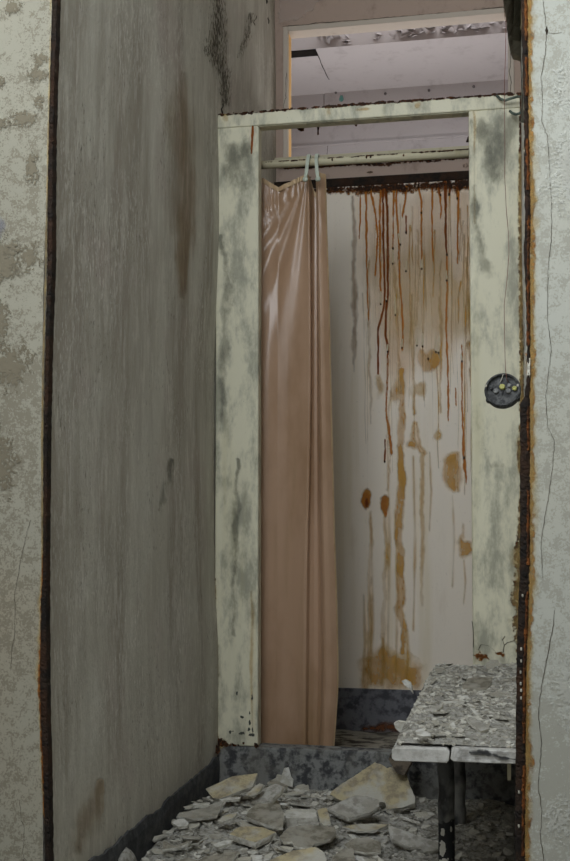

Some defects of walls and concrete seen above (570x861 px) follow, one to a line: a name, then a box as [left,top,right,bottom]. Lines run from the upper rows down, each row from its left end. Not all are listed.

rust [215,0,537,861]
damp [365,368,424,685]
crack [538,610,555,861]